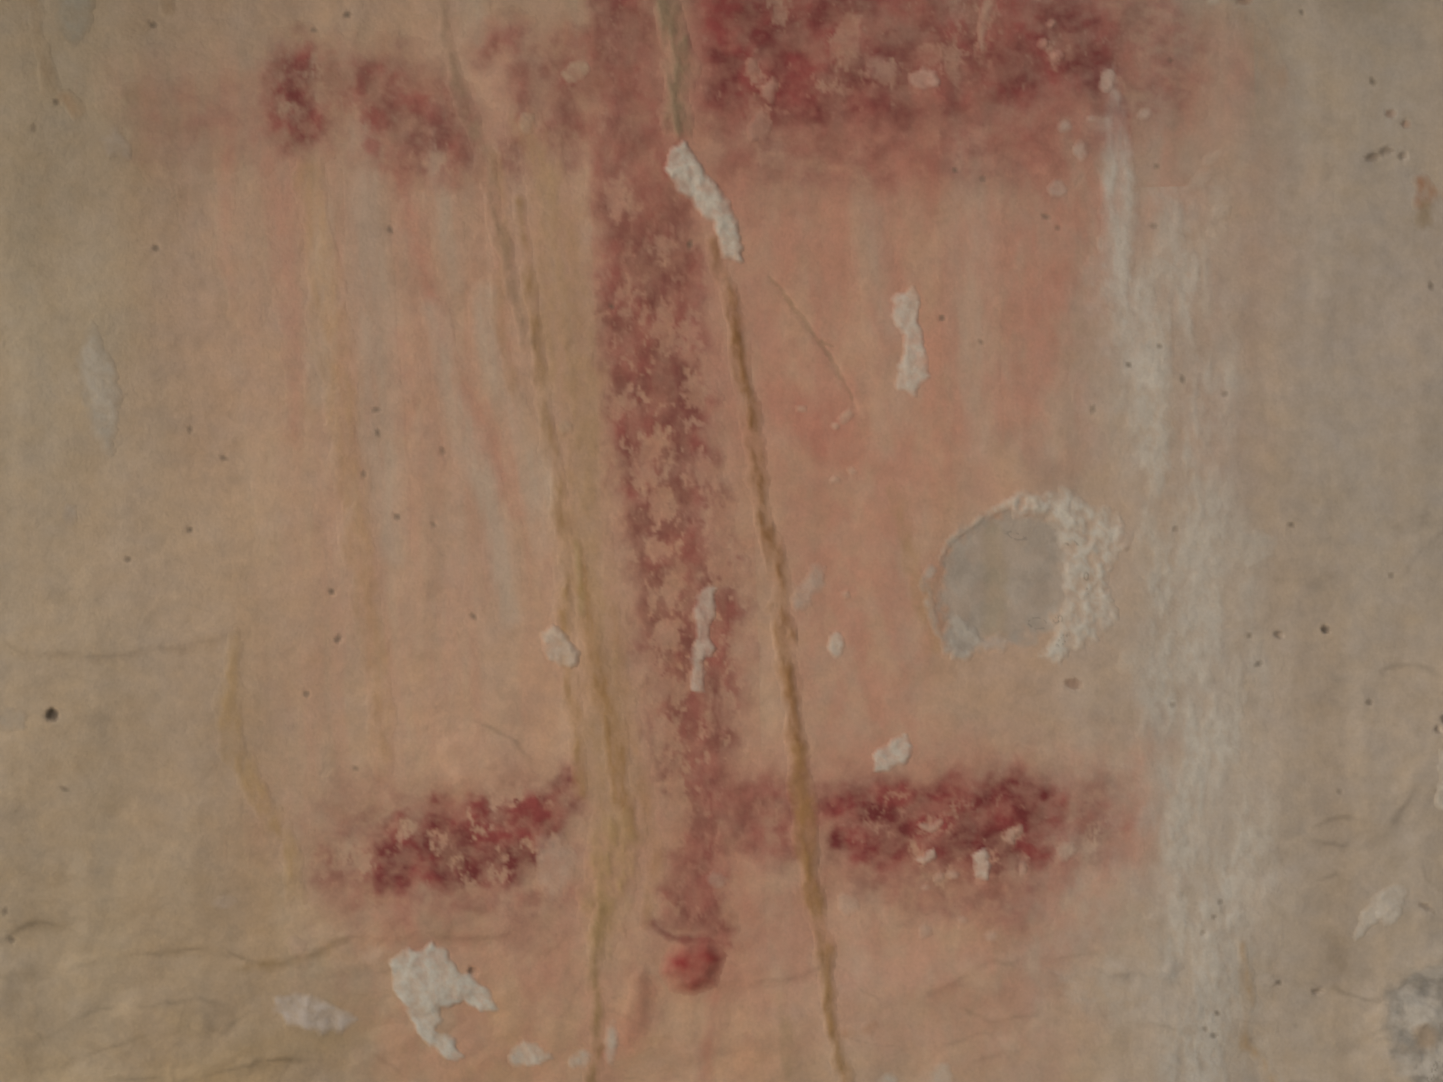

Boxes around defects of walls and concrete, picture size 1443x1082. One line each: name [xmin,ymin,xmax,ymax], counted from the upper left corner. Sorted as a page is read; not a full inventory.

peeling [663,139,745,266]
peeling [890,285,931,398]
water stain [419,0,667,1082]
spalling [917,485,1134,691]
efflorescence [1042,159,1299,1082]
peeling [270,990,359,1037]
peeling [388,939,500,1062]
spalling [1368,944,1443,1082]